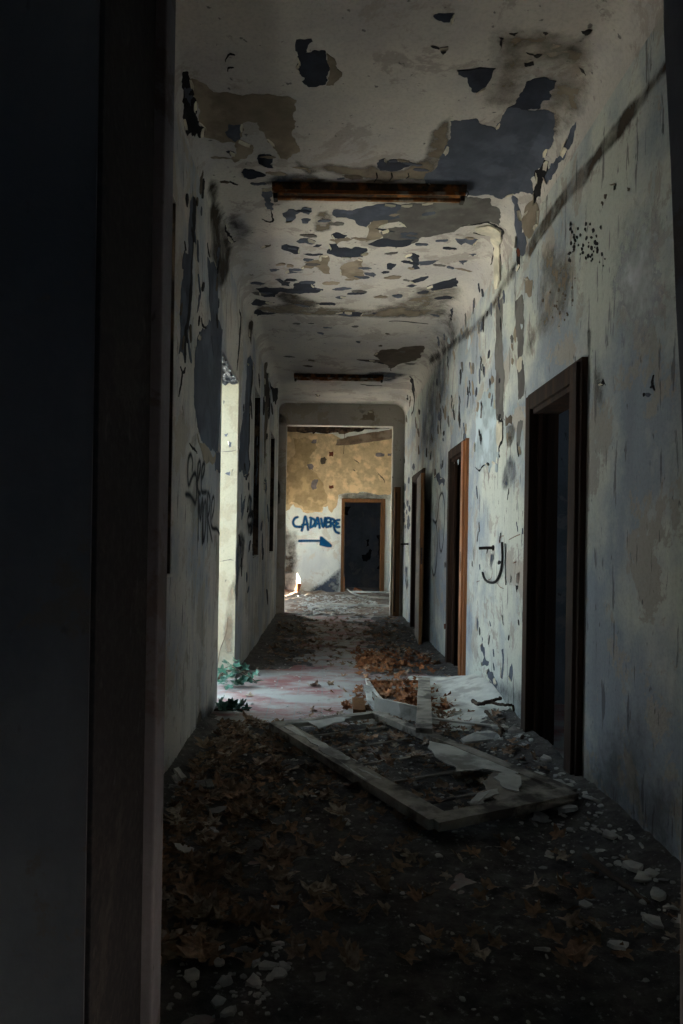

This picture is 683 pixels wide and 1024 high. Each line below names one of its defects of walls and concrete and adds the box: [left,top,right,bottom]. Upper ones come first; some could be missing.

peeling [295,38,342,87]
damp [491,32,586,127]
peeling [179,67,576,480]
peeling [286,429,392,515]